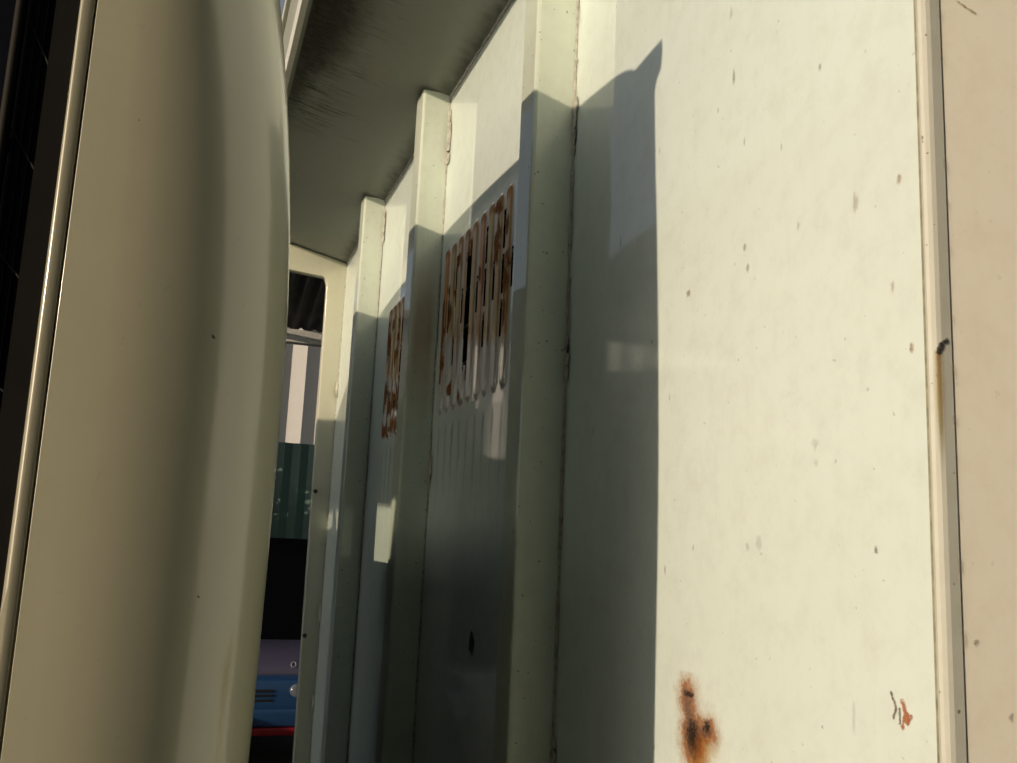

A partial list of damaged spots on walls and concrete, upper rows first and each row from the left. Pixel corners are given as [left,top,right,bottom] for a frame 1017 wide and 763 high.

corrosion [447,187,513,326]
corrosion [439,287,459,402]
corrosion [679,678,716,763]